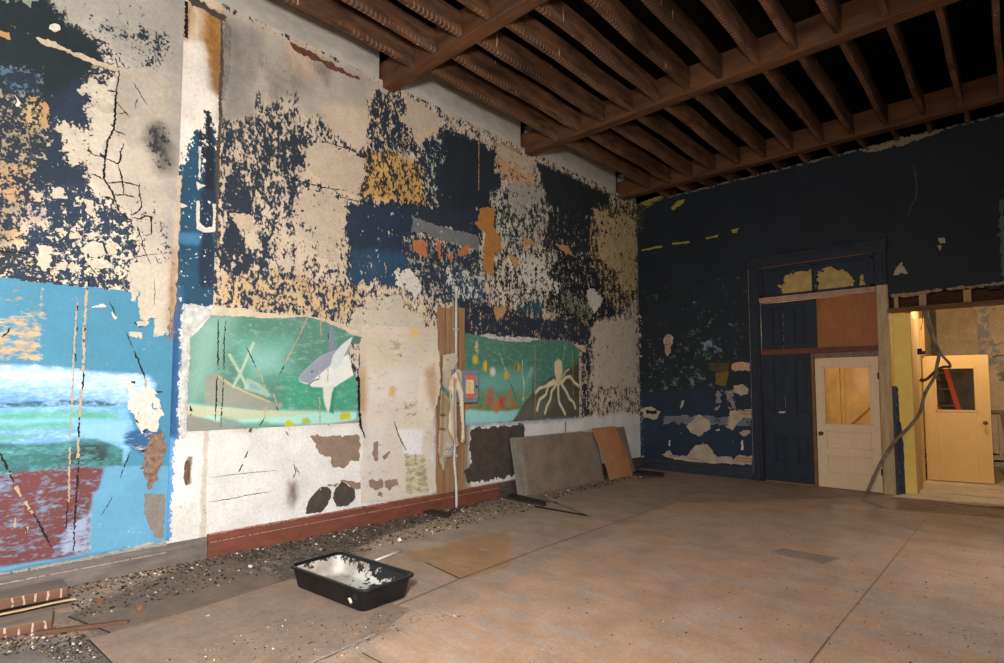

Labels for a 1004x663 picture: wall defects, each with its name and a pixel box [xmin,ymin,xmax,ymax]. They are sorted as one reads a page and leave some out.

peeling [15,23,127,166]
peeling [400,94,442,136]
peeling [30,187,68,202]
crack [1,67,159,319]
peeling [493,141,546,218]
peeling [411,207,560,295]
peeling [126,137,425,538]
peeling [494,306,507,320]
peeling [481,333,539,342]
flaking render [641,406,660,420]
flaking render [662,362,752,465]
flaking render [464,423,525,484]